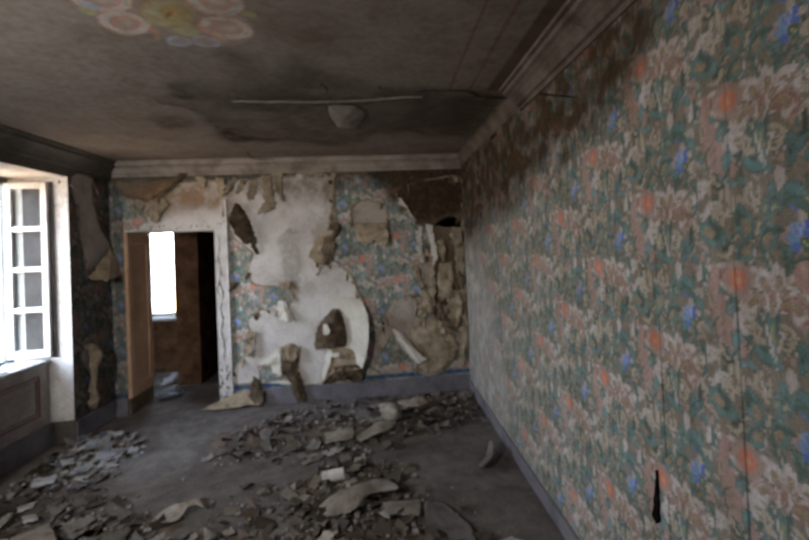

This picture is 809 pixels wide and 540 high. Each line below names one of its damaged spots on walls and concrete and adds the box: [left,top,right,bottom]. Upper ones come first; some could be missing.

flaking render [58,171,122,281]
flaking render [114,172,468,400]